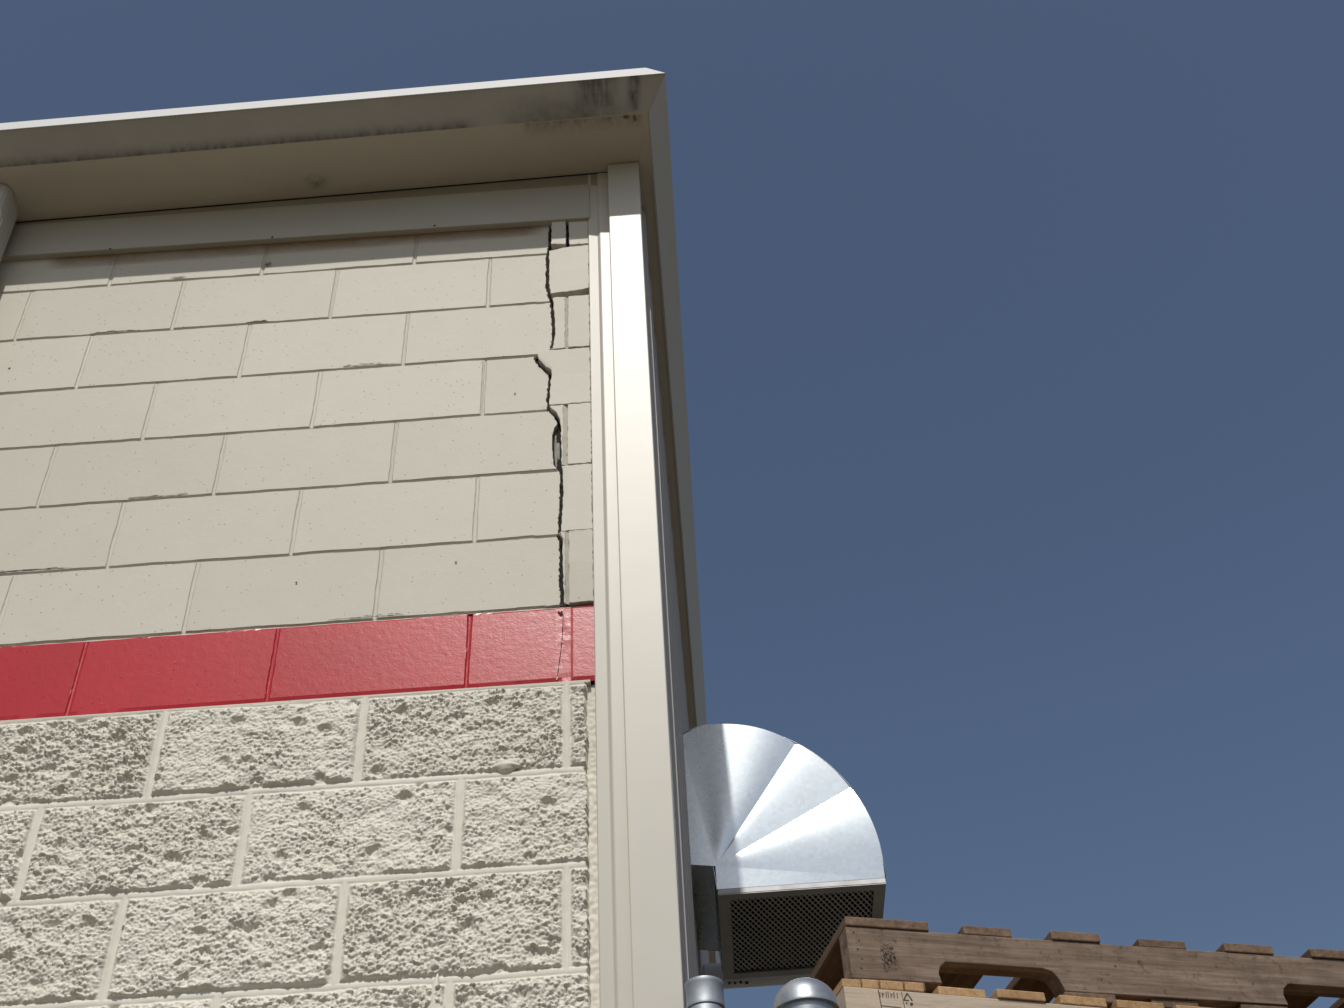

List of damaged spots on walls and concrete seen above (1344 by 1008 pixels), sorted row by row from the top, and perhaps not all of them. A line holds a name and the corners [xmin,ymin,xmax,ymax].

crack [535,226,569,680]